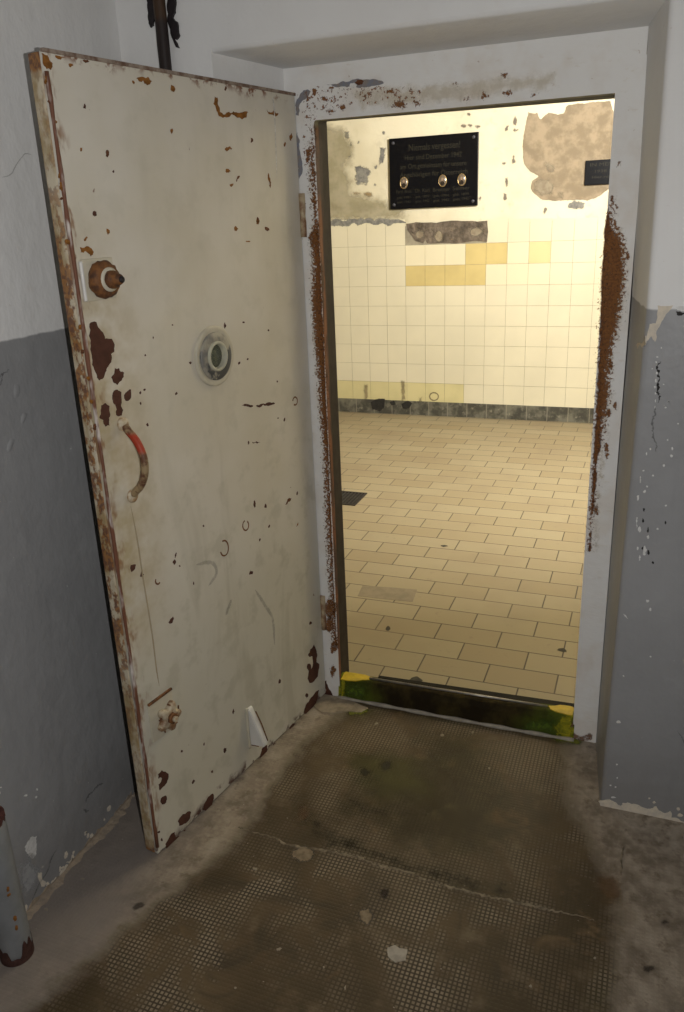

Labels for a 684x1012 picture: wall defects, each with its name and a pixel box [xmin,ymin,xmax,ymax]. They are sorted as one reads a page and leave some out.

spalling [503,101,614,213]
peeling [406,221,488,244]
rust [78,321,146,430]
rust [284,86,421,654]
rust [586,195,630,552]
peeling [636,305,684,349]
crack [652,347,670,408]
spalling [636,470,666,564]
rust [304,645,336,714]
peeling [599,777,684,823]
spalling [20,790,138,920]
crack [238,827,594,920]